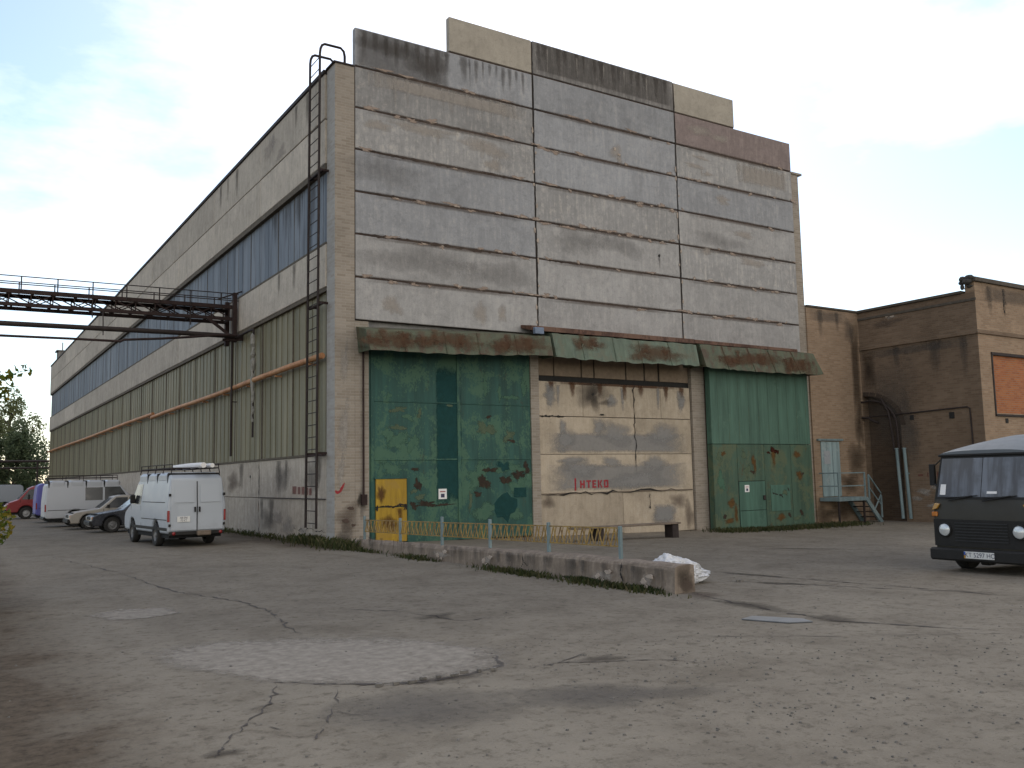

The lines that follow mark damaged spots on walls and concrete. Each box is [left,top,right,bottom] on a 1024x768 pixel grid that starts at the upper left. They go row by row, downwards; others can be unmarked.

water stain [392,79,506,115]
corrosion [363,328,548,352]
corrosion [632,345,678,361]
crack [553,381,692,509]